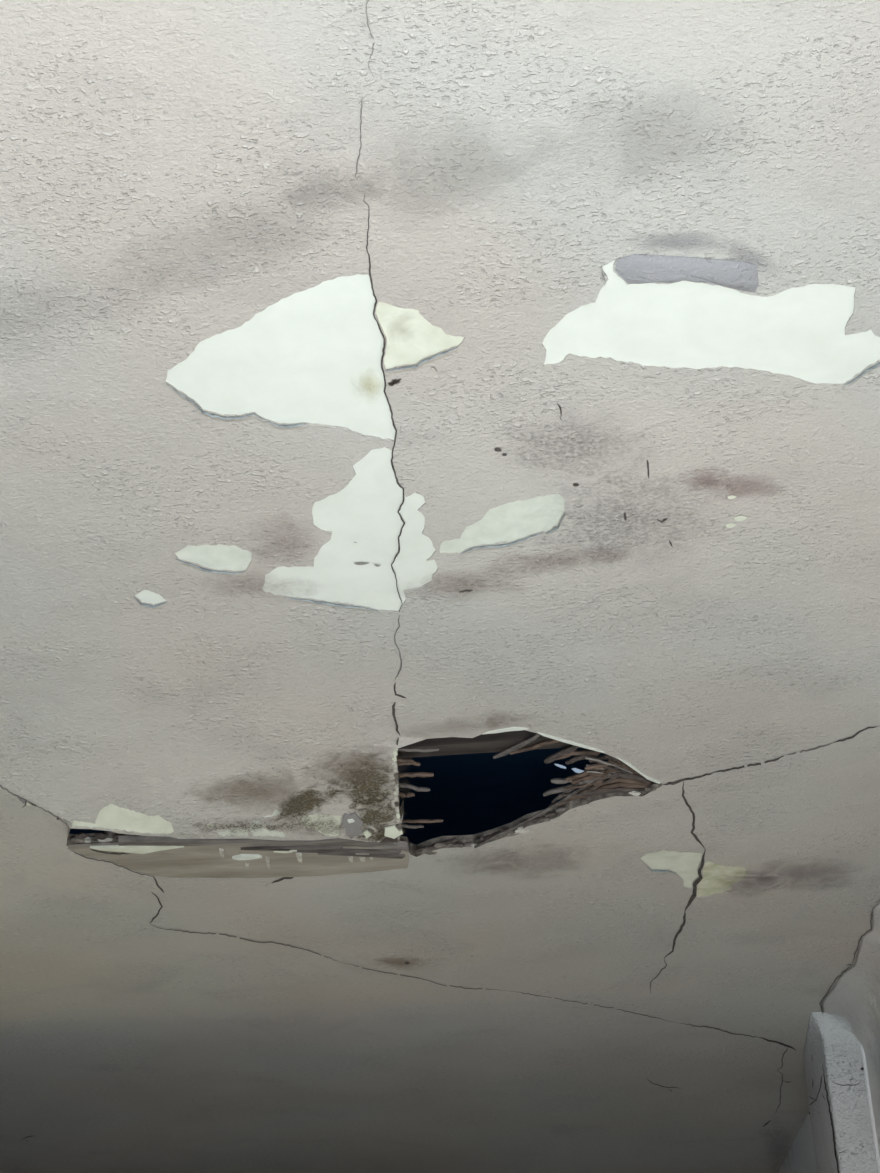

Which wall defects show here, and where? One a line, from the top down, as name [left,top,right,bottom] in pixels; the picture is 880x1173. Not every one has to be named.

crack [366,0,375,77]
peeling [542,260,880,390]
peeling [166,274,565,615]
crack [354,102,406,745]
peeling [134,590,168,609]
spalling [68,749,477,878]
leakage [198,763,401,842]
spalling [482,727,661,796]
peeling [640,850,747,897]
crack [0,726,880,1173]